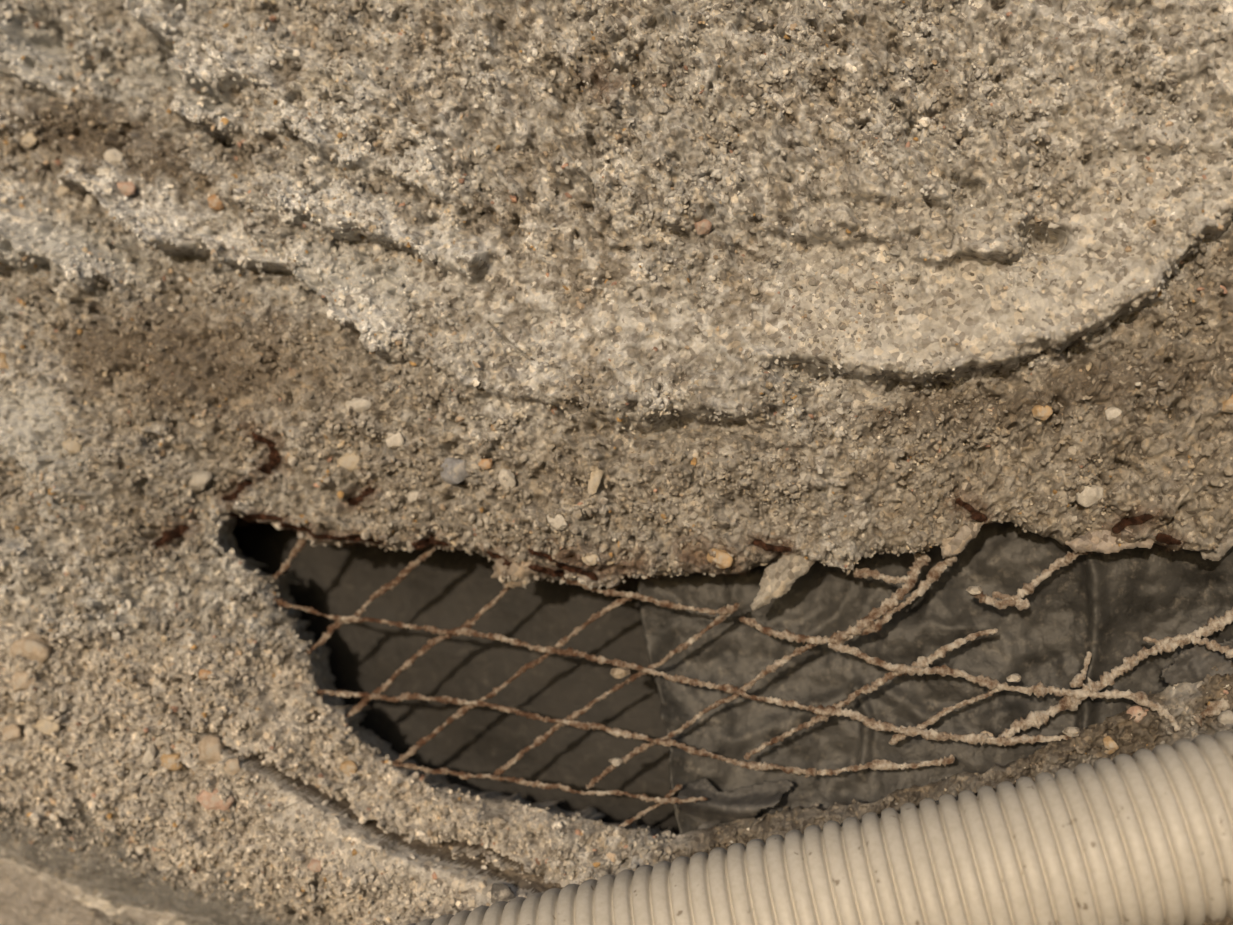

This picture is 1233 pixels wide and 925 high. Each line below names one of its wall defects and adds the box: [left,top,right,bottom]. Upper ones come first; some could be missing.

spalling [586,230,1233,612]
corrosion [221,431,384,544]
corrosion [411,535,448,549]
corrosion [752,539,792,553]
corrosion [1112,514,1153,534]
corrosion [1155,533,1181,545]
corrosion [486,548,598,581]
spalling [211,516,1173,842]
crack [126,671,563,893]